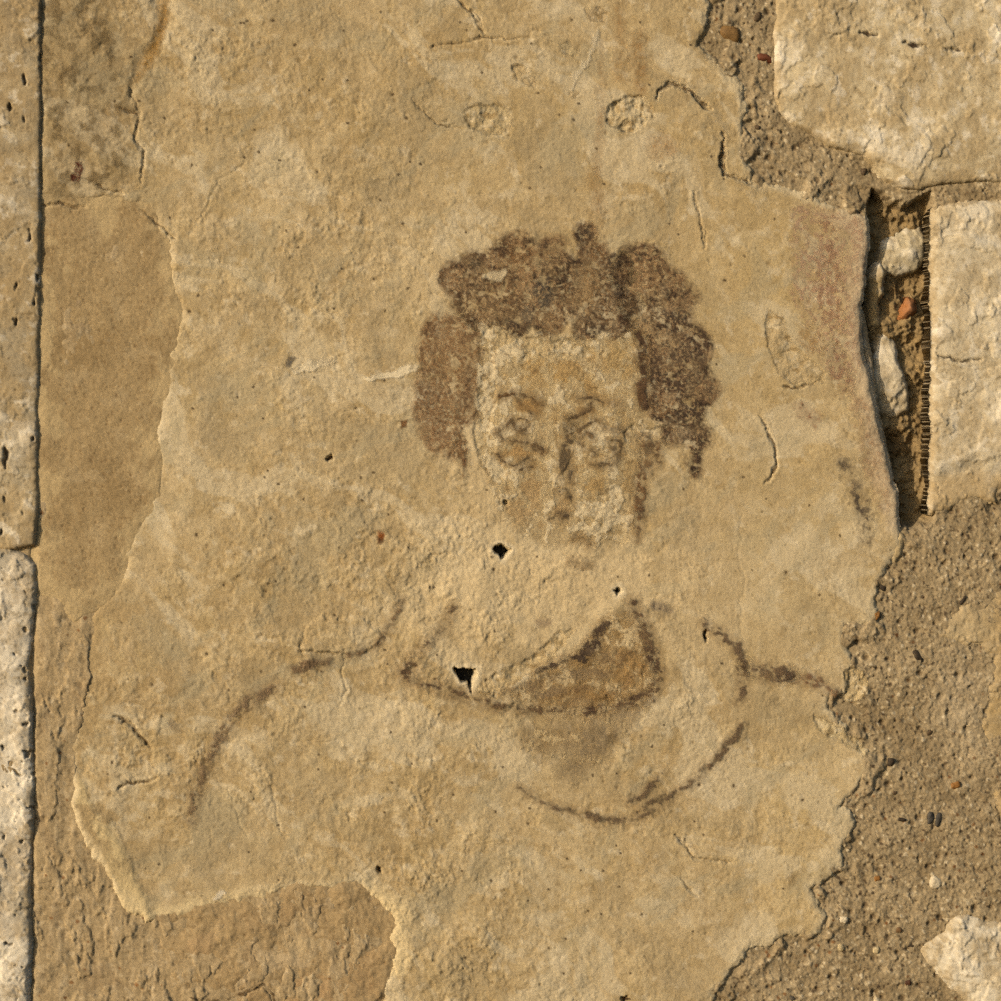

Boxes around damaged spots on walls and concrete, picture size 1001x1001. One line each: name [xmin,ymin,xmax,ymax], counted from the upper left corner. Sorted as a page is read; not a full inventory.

spalling [897,297,917,320]
spalling [844,668,868,703]